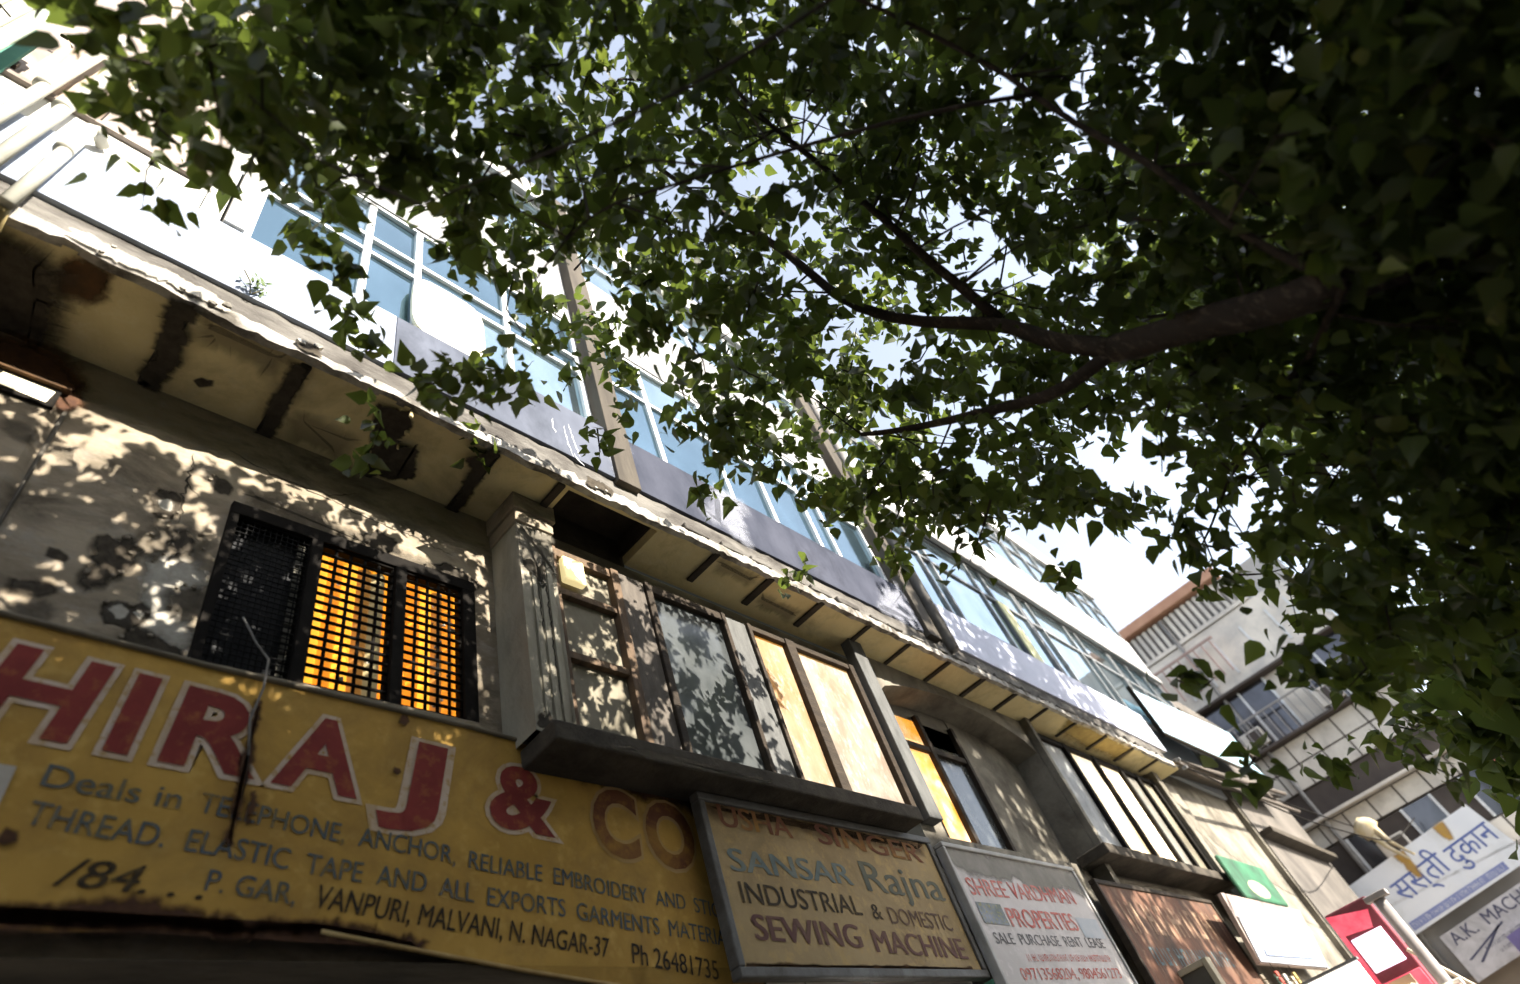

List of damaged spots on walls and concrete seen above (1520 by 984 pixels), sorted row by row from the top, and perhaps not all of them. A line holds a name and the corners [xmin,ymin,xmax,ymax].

leakage [0,237,79,352]
leakage [137,298,199,392]
leakage [193,378,214,387]
leakage [254,363,308,439]
peeling [46,489,209,655]